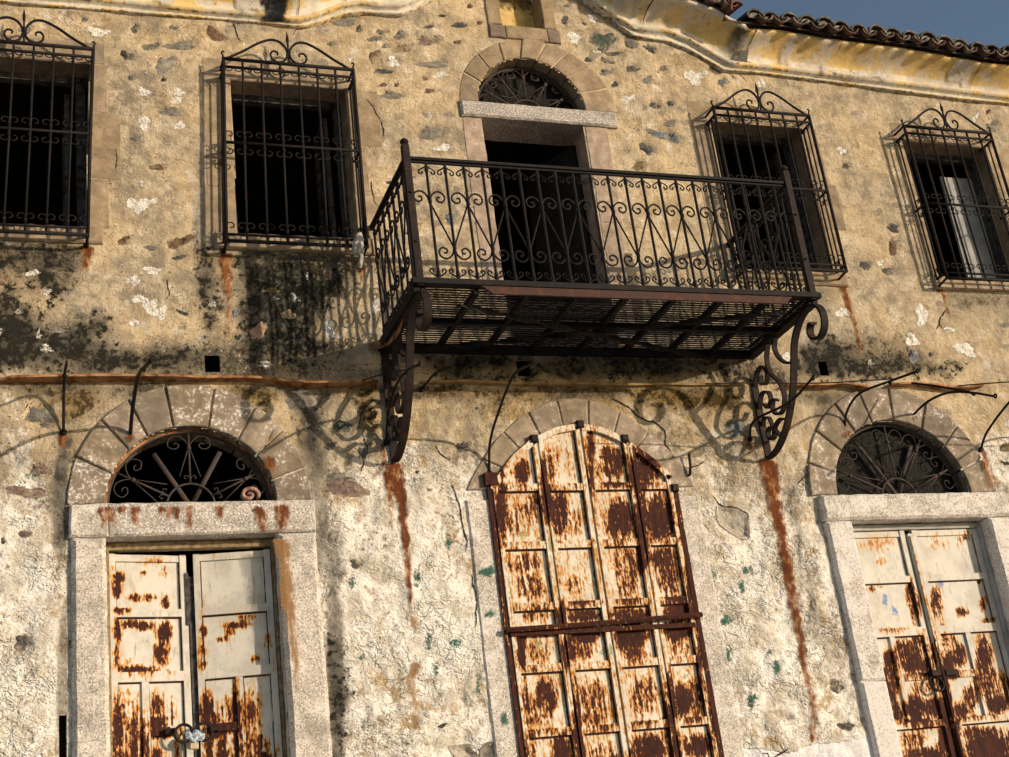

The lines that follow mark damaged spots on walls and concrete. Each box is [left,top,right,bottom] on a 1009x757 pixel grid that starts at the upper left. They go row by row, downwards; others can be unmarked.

flaking render [82,17,111,37]
flaking render [330,14,482,99]
flaking render [733,50,749,62]
flaking render [972,109,1000,132]
water stain [0,240,223,374]
water stain [224,256,353,370]
water stain [797,334,968,396]
rust [98,506,140,524]
rust [159,506,192,527]
rust [381,444,412,605]
rust [253,504,299,672]
rust [748,441,818,742]